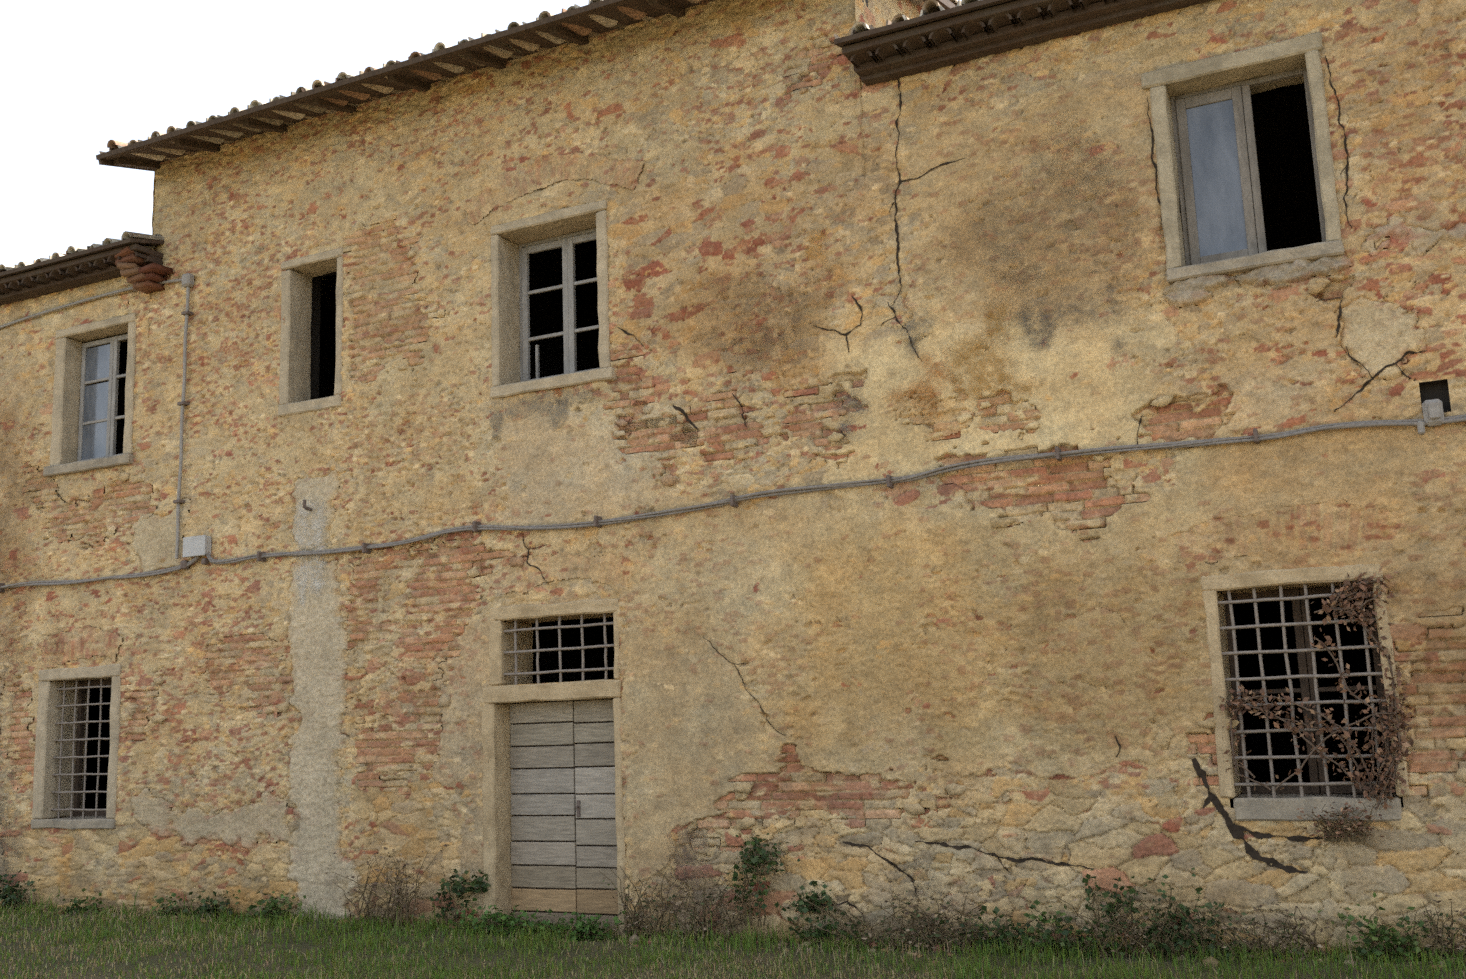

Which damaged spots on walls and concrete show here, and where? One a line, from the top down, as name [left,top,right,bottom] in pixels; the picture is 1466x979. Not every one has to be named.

crack [815,79,964,361]
spalling [603,344,869,486]
spalling [888,384,1150,543]
spalling [1133,386,1234,442]
spalling [343,523,533,795]
crack [703,636,784,735]
spalling [1393,606,1466,796]
spalling [690,744,966,852]